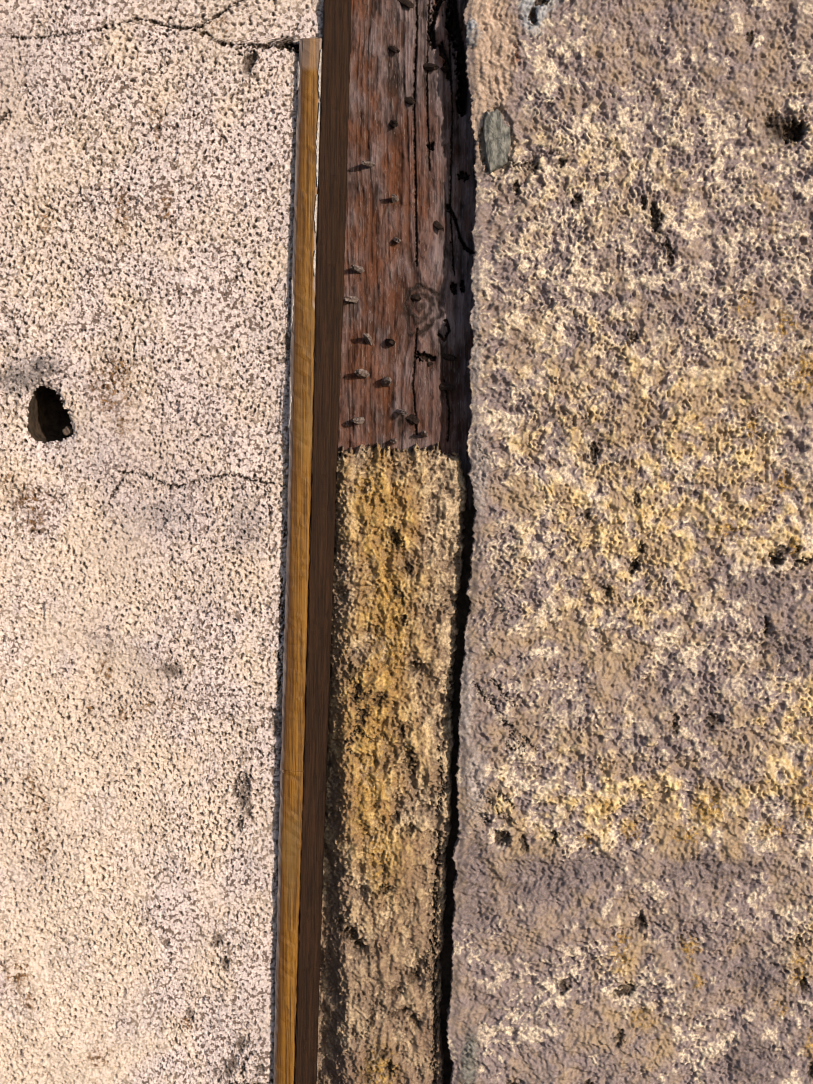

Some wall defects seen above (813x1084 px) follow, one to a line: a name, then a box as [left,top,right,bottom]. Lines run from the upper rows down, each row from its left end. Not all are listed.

crack [11,0,297,50]